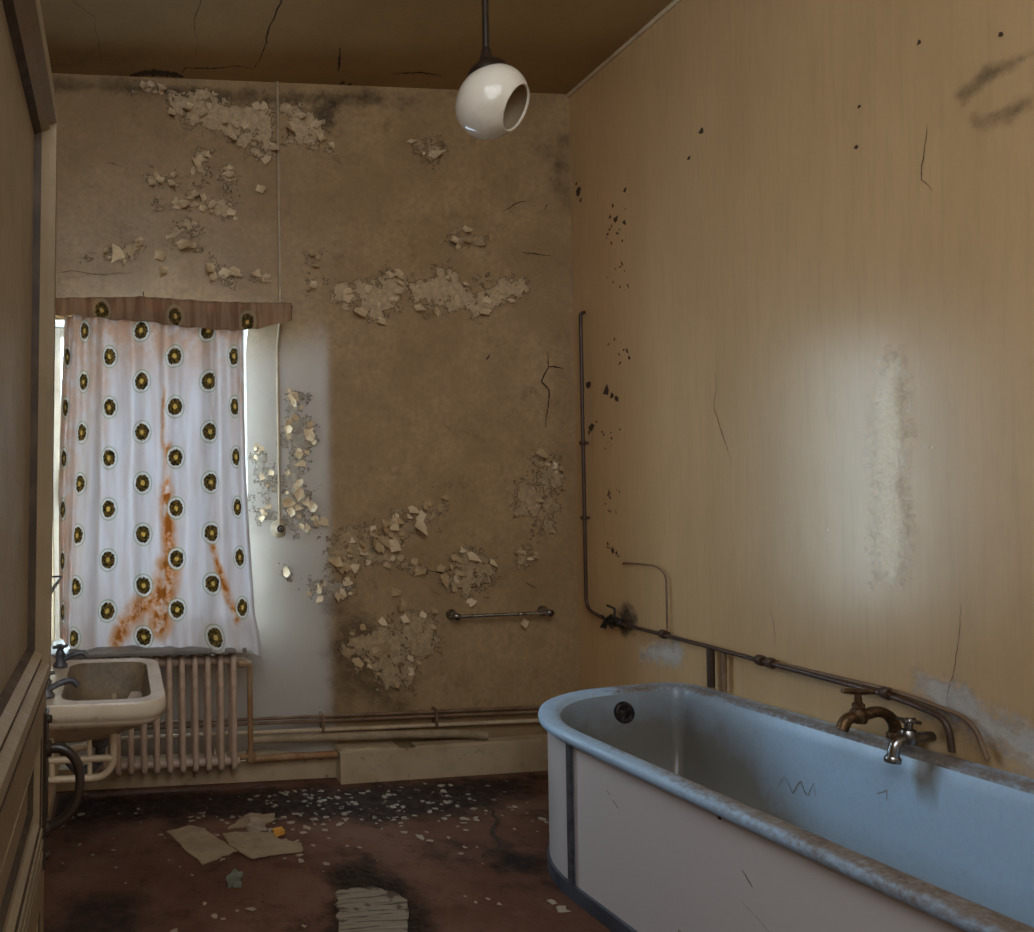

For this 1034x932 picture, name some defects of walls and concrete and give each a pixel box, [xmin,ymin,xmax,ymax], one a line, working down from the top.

crack [130,0,282,78]
peeling [80,77,338,291]
peeling [302,222,530,325]
peeling [247,388,503,705]